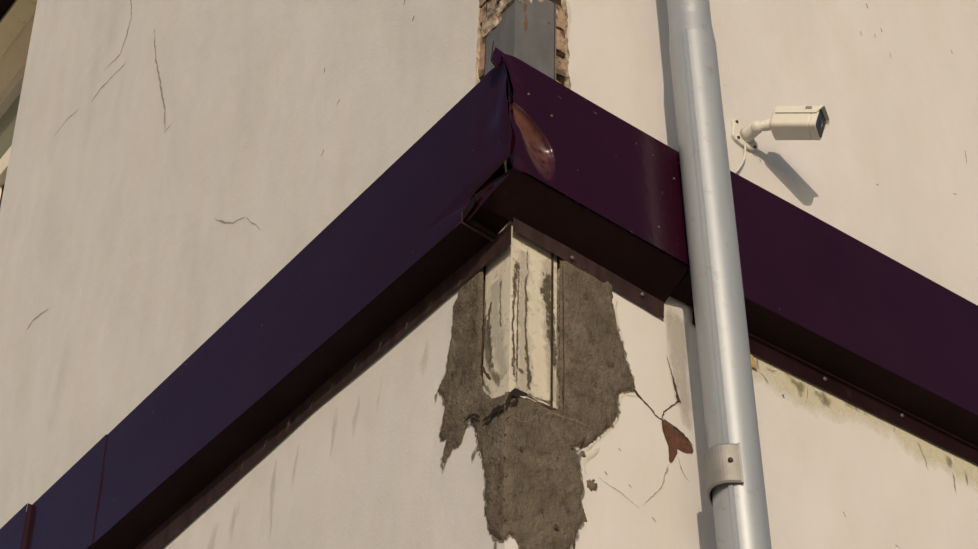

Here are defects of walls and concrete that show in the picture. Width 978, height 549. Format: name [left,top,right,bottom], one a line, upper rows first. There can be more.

flaking render [475,0,571,89]
flaking render [550,252,560,409]
peeling [613,298,631,368]
crack [633,358,682,420]
leakage [750,353,876,417]
peeling [583,393,637,476]
flaking render [662,419,694,463]
leakage [919,439,977,489]